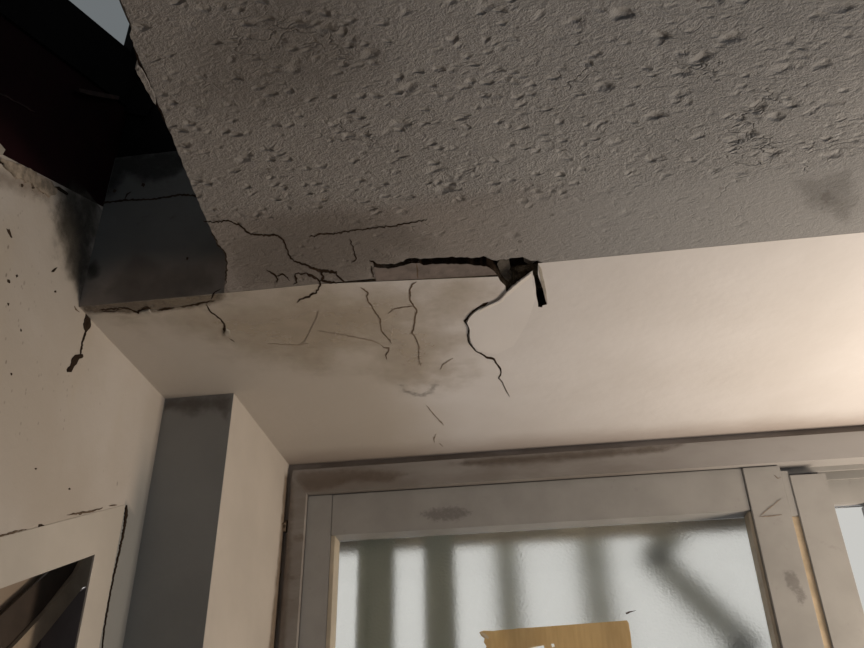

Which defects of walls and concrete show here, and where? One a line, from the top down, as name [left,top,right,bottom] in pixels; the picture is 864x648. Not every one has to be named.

flaking render [0,144,57,198]
crack [102,192,196,205]
crack [101,219,453,370]
crack [464,302,510,397]
peeling [467,257,547,354]
crack [70,505,128,648]